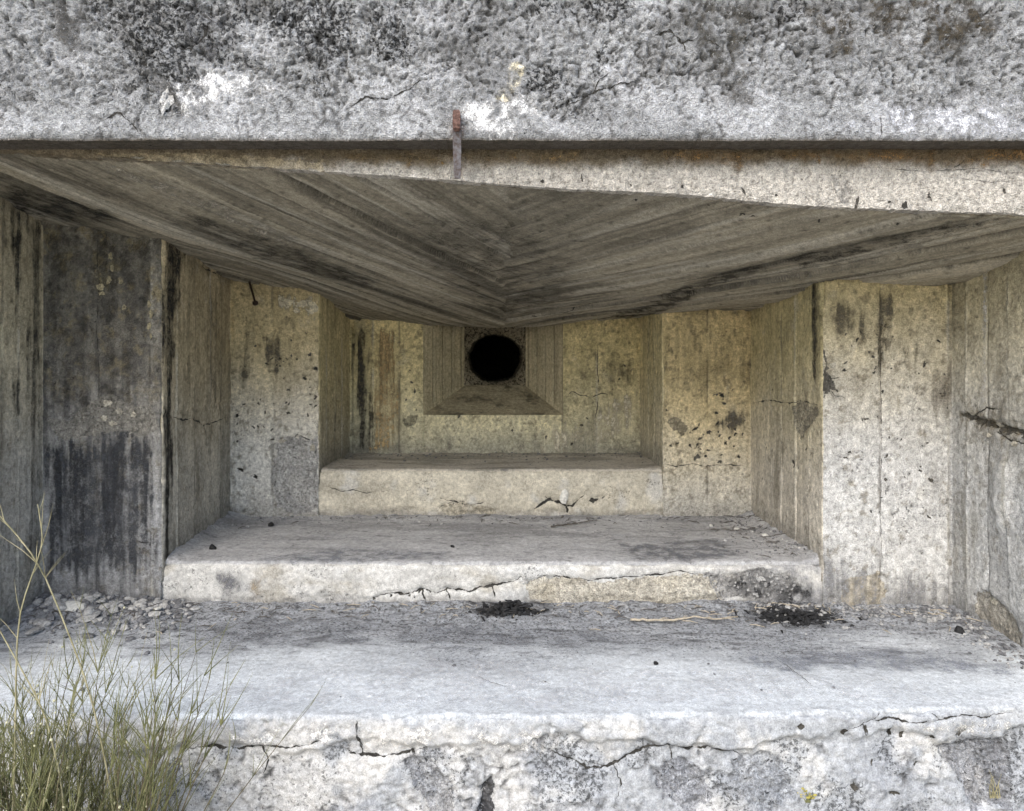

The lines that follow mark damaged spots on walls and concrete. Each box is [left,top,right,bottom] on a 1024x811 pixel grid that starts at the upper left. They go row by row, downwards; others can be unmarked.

leakage [13,214,41,438]
leakage [29,242,186,580]
crack [966,407,1024,444]
crack [534,495,604,513]
crack [376,570,705,599]
spalling [974,590,1023,646]
crack [854,712,1007,728]
crack [184,722,427,777]